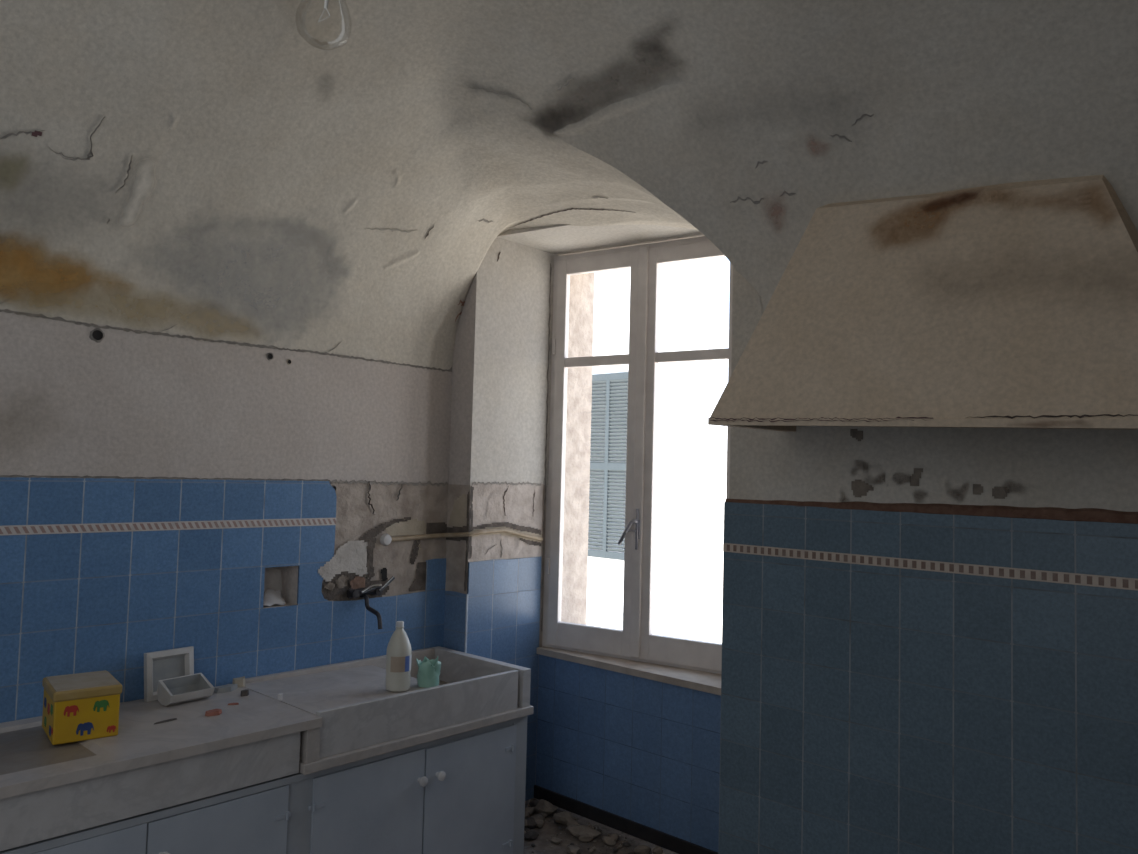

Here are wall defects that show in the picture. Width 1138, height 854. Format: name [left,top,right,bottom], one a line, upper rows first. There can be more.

crack [0,117,105,161]
crack [367,226,434,238]
flaking render [725,462,1138,524]
flaking render [318,479,543,601]